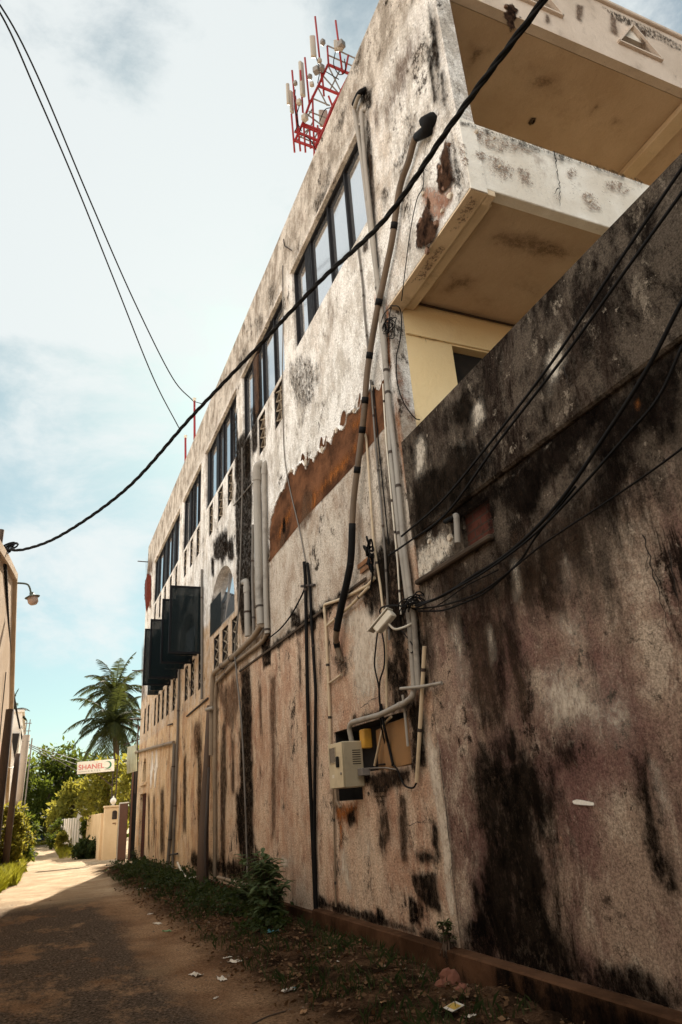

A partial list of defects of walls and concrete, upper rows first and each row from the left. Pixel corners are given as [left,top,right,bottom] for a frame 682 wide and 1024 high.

mould [461,122,642,184]
peeling [268,379,387,562]
damp [191,343,682,1024]